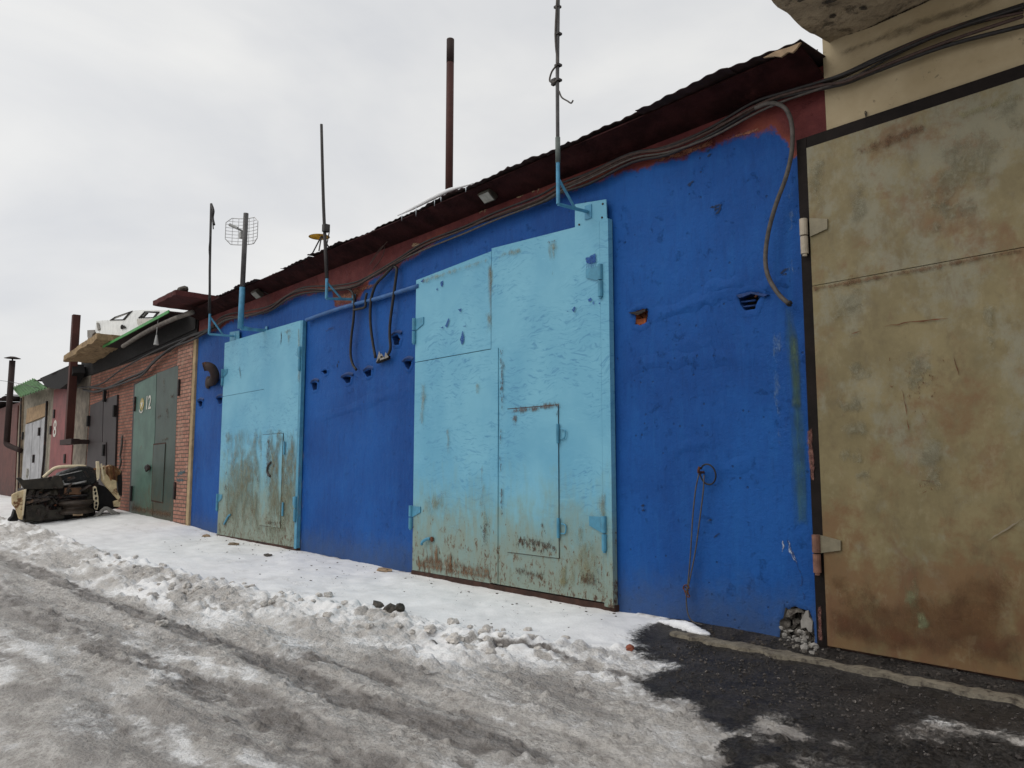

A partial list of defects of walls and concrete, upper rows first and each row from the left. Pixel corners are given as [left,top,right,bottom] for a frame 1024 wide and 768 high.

corrosion [518,524,555,551]
corrosion [418,546,489,578]
spalling [773,599,817,643]